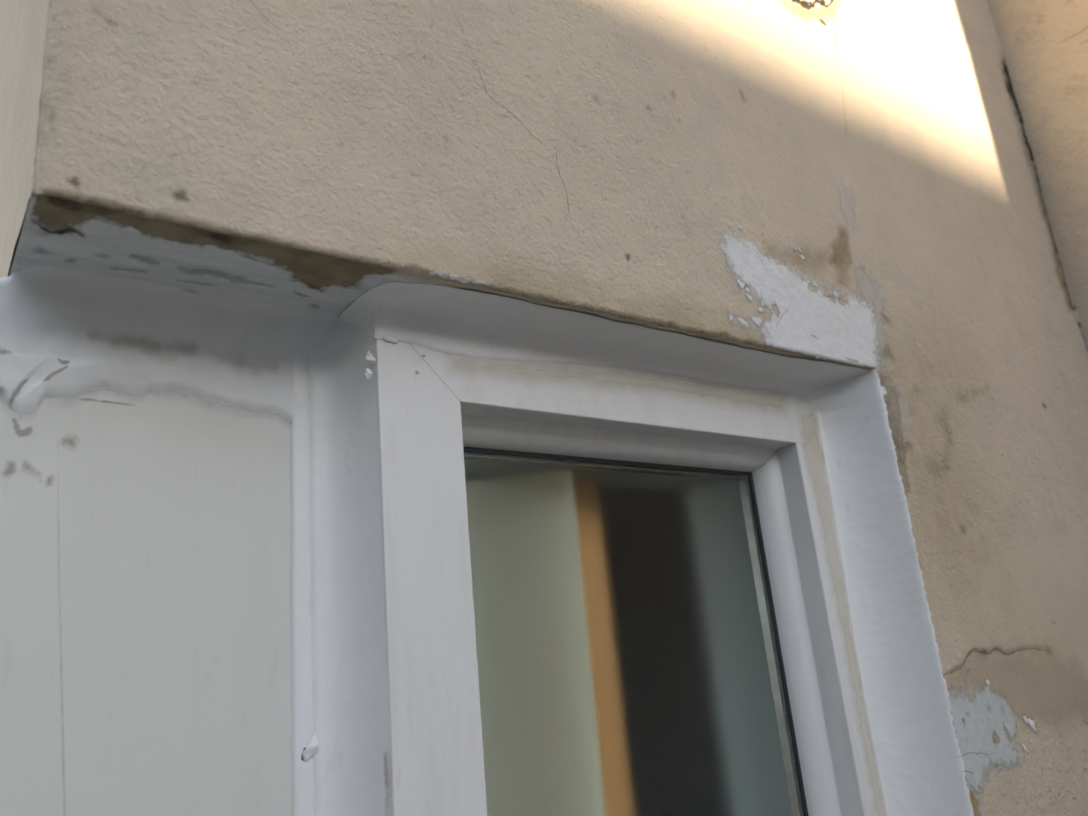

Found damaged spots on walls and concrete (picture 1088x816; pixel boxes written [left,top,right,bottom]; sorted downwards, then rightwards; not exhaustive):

crack [785,0,837,26]
peeling [31,194,406,289]
crack [1004,63,1088,350]
peeling [729,280,764,327]